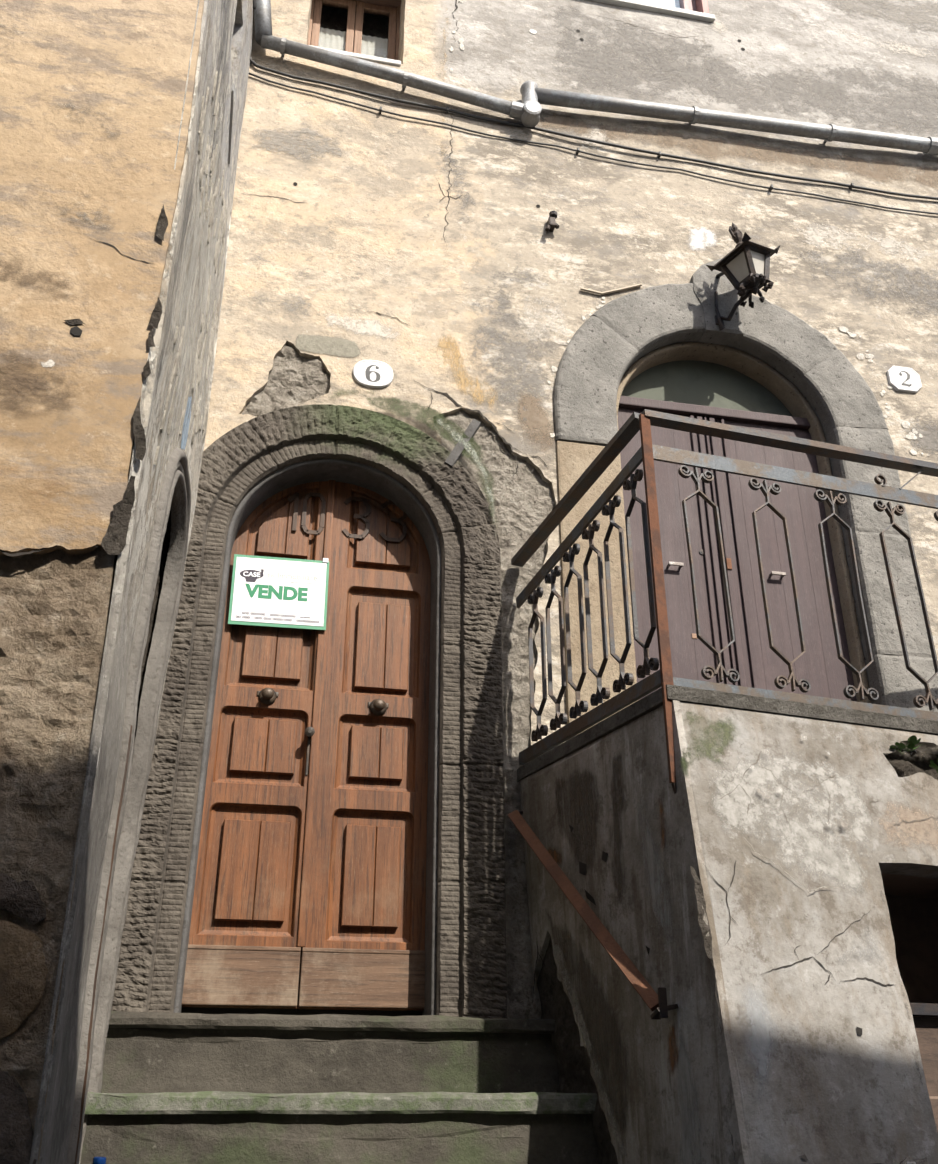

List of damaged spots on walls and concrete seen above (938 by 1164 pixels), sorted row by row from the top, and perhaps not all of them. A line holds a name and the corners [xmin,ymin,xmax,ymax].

crack [450,0,464,72]
crack [436,119,464,250]
water stain [0,353,70,411]
spalling [241,346,330,417]
water stain [438,420,494,505]
spalling [437,410,555,1019]
hole [885,748,938,780]
spalling [0,476,136,1164]
crack [705,861,738,1038]
crack [763,912,895,986]
flaking render [554,944,625,1155]